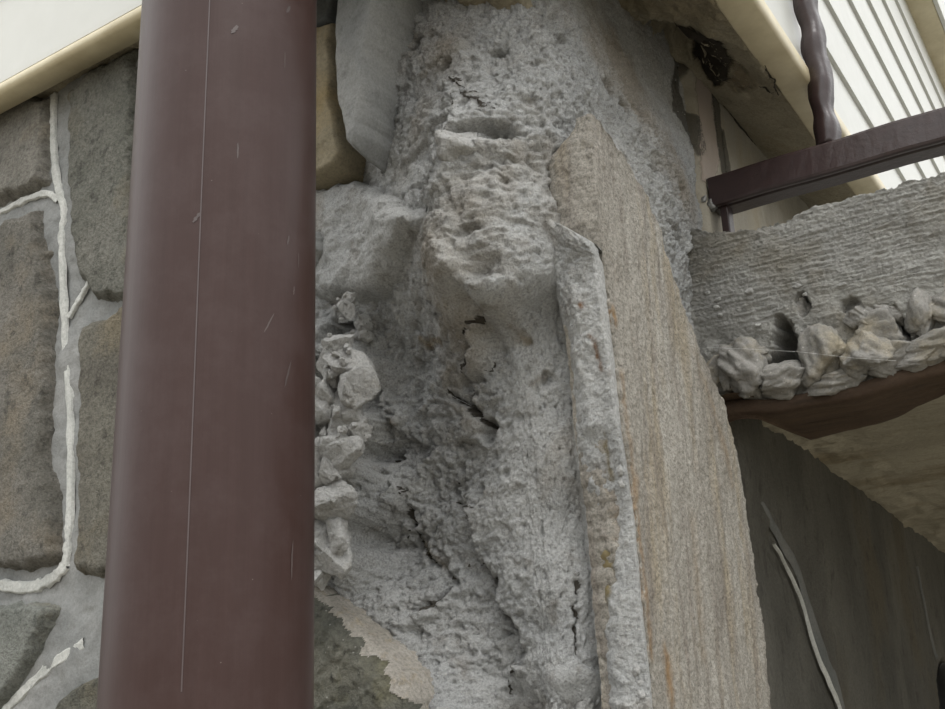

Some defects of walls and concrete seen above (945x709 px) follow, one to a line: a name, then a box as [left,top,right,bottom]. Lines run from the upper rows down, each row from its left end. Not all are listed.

crack [447,314,499,430]
spalling [706,283,945,400]
crack [397,486,498,616]
crack [571,572,581,655]